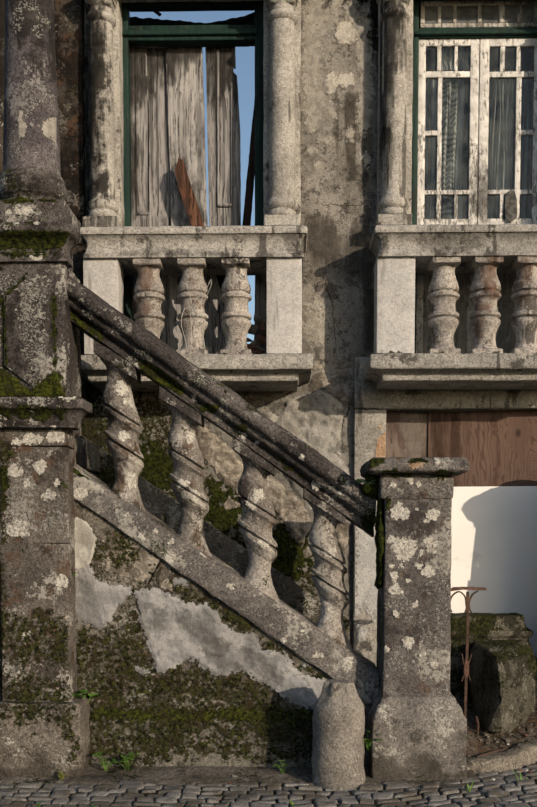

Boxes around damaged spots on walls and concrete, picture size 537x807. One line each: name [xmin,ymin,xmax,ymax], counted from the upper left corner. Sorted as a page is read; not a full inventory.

leakage [84,0,106,216]
leakage [130,47,237,110]
leakage [325,0,407,182]
leakage [131,126,142,215]
crack [315,274,342,347]
spalling [266,476,312,558]
peeling [75,517,327,709]